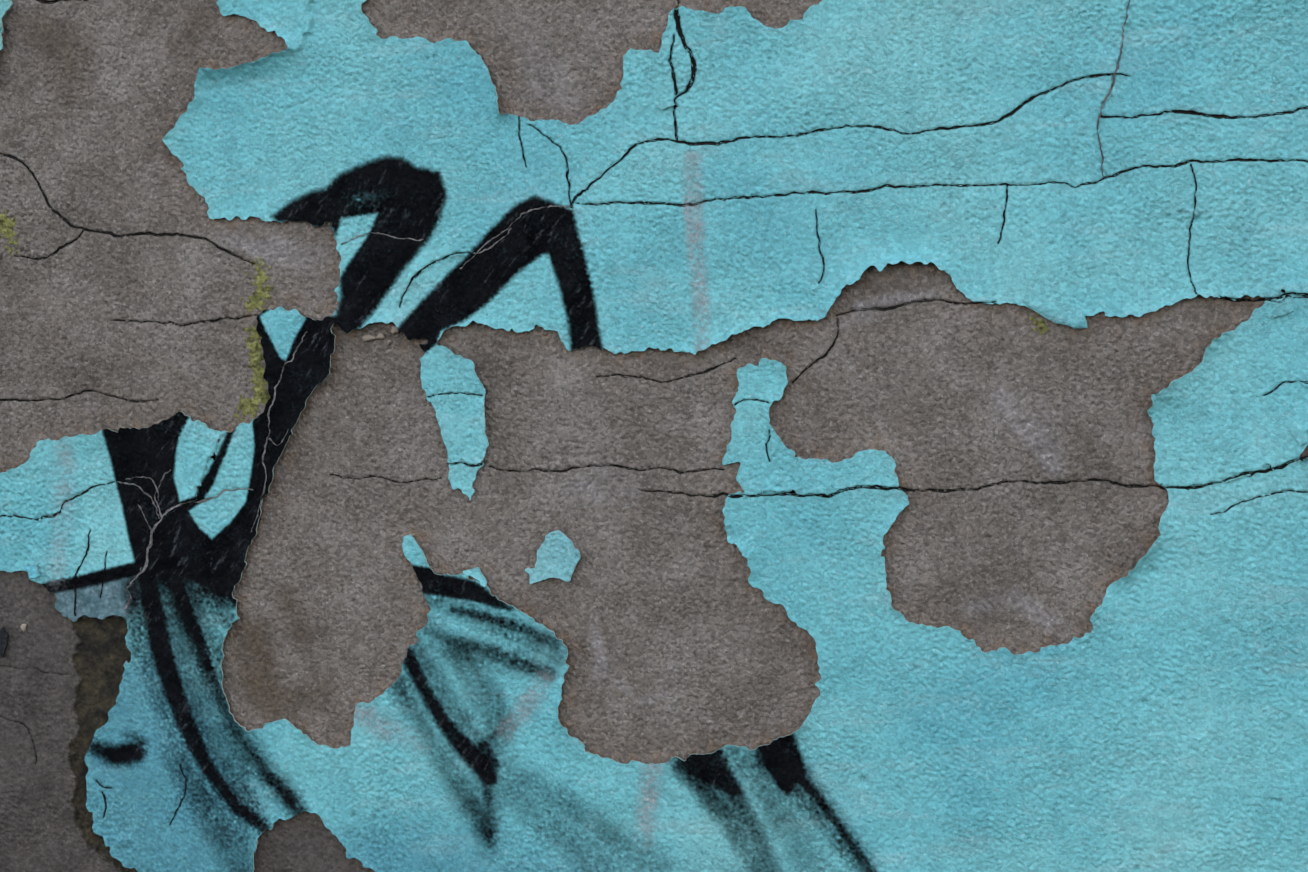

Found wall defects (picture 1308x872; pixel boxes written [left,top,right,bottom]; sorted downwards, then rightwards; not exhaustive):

peeling [362,0,822,125]
crack [1,153,255,264]
peeling [0,0,341,473]
crack [341,0,1308,307]
crack [110,314,259,326]
crack [596,358,736,383]
crack [734,299,995,462]
crack [0,332,307,616]
peeling [222,261,1294,764]
crack [329,456,1308,515]
peeling [1290,428,1308,461]
peeling [254,811,375,872]